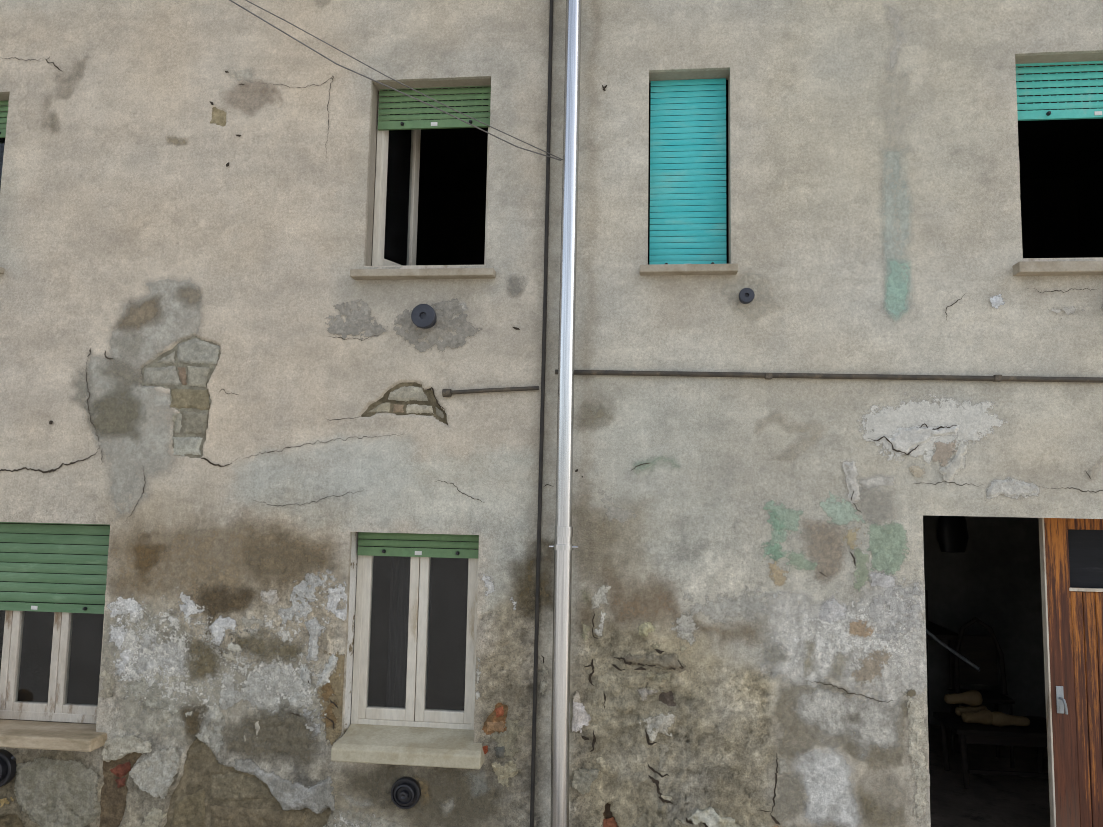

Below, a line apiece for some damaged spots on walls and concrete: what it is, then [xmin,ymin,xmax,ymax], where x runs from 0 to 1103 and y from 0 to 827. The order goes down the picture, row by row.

crack [0,348,113,473]
flaking render [141,336,221,458]
crack [201,434,403,467]
crack [253,491,359,506]
flaking render [328,382,448,425]
peeling [858,392,1008,485]
leakage [102,523,337,765]
flaking render [98,569,347,827]
peeling [572,691,591,733]
flaking render [612,622,693,773]
flaking render [674,807,740,827]
peeling [903,689,930,823]